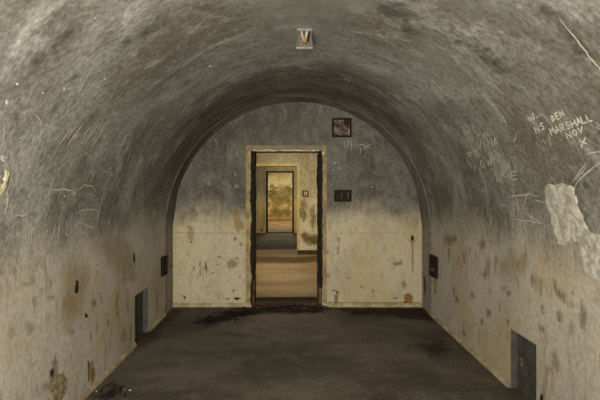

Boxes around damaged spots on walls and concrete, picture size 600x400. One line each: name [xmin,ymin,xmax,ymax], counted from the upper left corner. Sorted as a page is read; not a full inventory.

flaking render [0,155,10,195]
leakage [302,233,318,245]
flaking render [544,183,600,280]
flaking render [47,359,67,400]